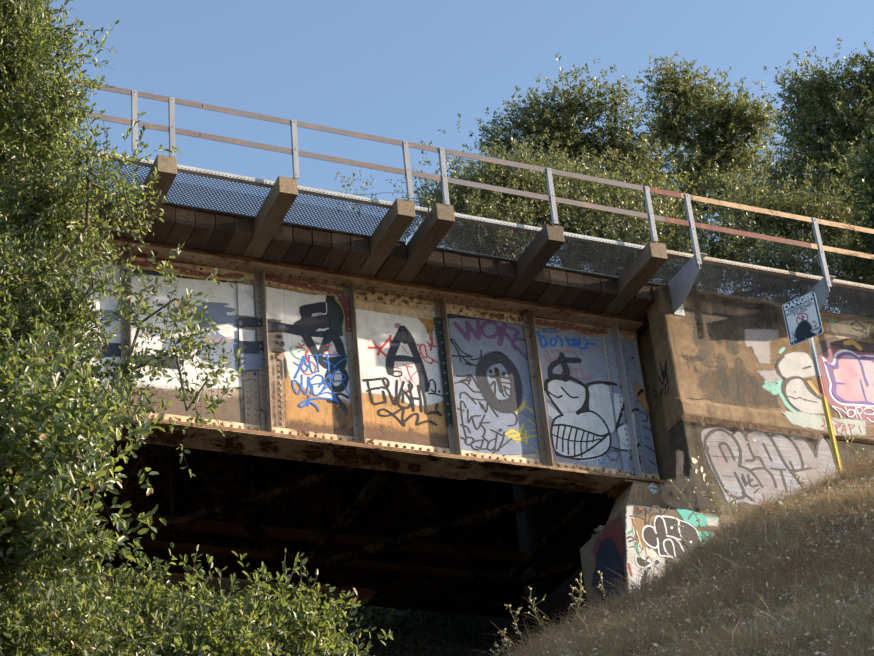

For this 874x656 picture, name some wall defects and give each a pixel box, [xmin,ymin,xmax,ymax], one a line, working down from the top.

leakage [683,287,779,408]
corrosion [113,422,187,445]
corrosion [457,461,550,478]